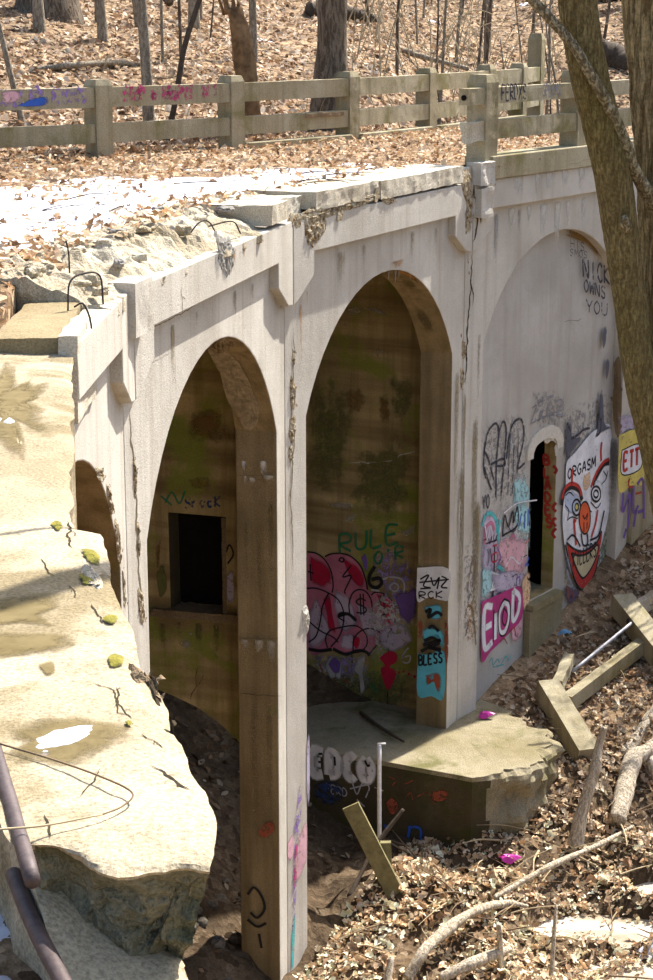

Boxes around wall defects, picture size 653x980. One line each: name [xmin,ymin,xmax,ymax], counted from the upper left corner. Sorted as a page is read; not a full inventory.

spalling [0,200,264,329]
spalling [287,189,397,248]
spalling [461,169,474,234]
crack [465,185,481,384]
spalling [81,562,103,589]
spalling [95,467,147,625]